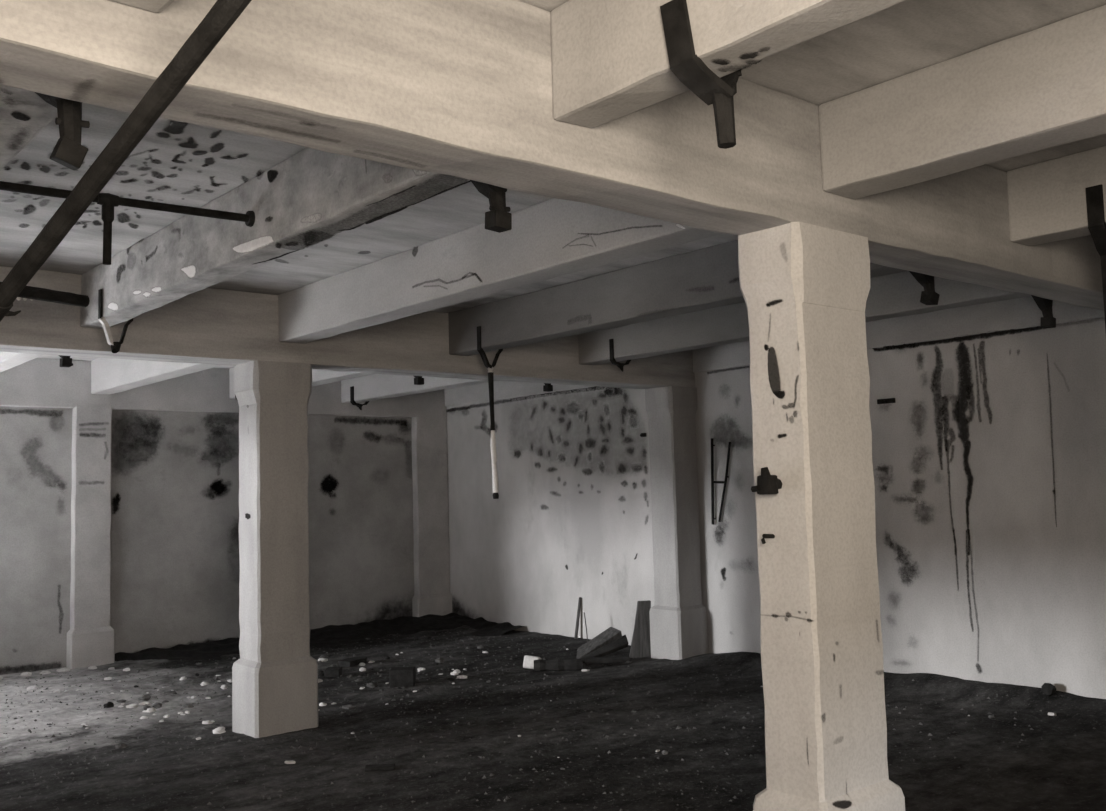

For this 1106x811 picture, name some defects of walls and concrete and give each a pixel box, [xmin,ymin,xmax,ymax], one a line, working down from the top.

peeling [4,160,68,194]
peeling [115,121,247,199]
spalling [242,170,278,183]
peeling [19,199,49,228]
peeling [118,213,140,229]
crack [578,225,661,246]
leakage [114,415,158,471]
leakage [515,386,646,495]
leakage [931,341,992,632]
leakage [886,535,916,582]